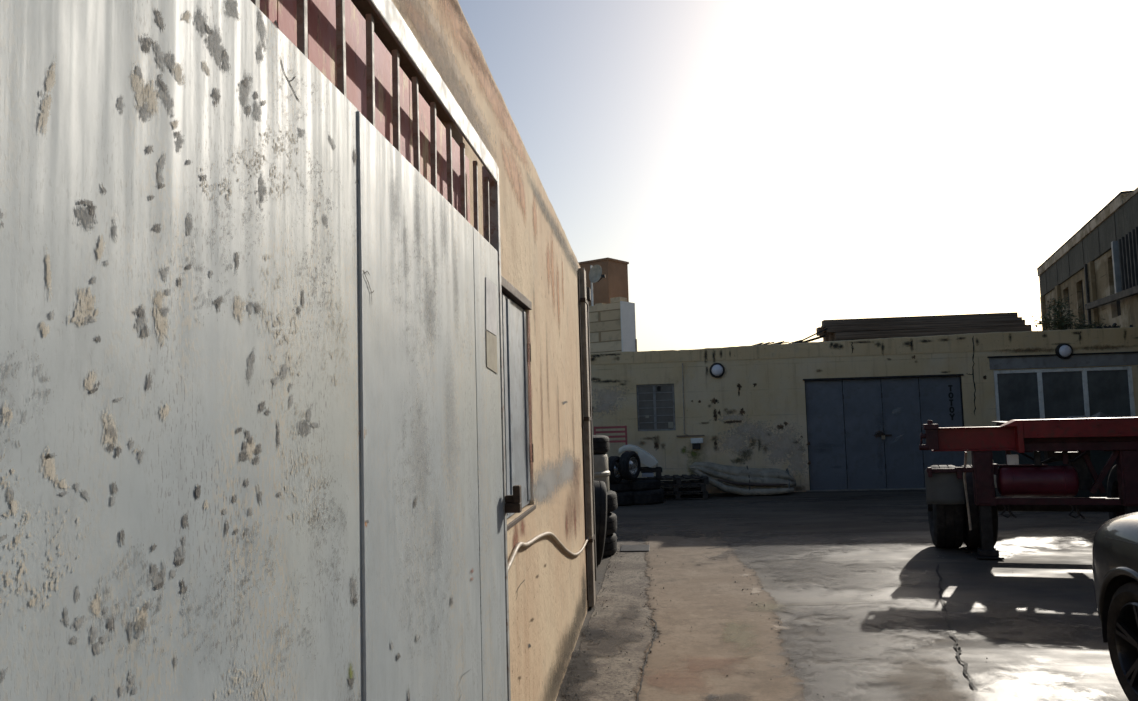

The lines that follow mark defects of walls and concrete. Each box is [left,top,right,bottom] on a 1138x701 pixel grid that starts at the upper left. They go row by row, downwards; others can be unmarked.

peeling [223,0,240,21]
peeling [117,7,317,210]
rust [444,0,537,238]
peeling [40,184,117,343]
peeling [134,264,191,346]
peeling [214,246,348,448]
peeling [237,427,262,464]
peeling [0,442,95,629]
peeling [62,513,189,656]
crack [917,564,978,701]